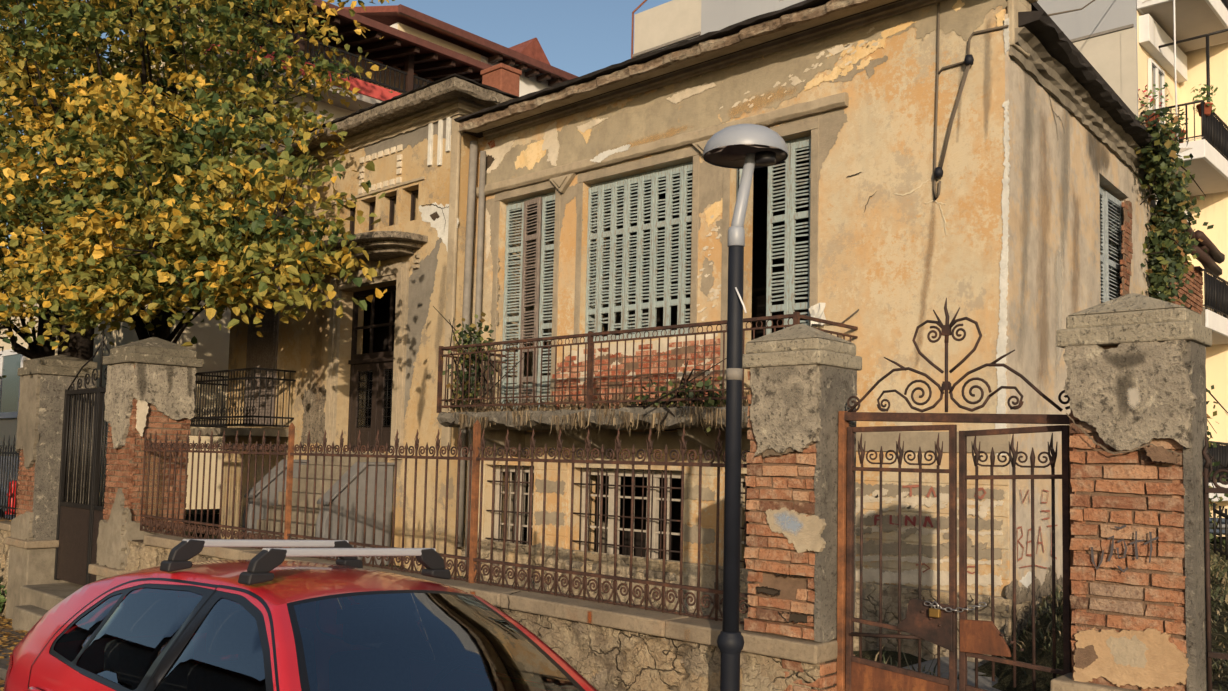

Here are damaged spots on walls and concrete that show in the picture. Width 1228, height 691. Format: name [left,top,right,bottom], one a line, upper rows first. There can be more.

peeling [479,0,1010,334]
peeling [404,202,459,419]
spalling [552,160,723,410]
spalling [994,100,1011,429]
leakage [1115,355,1142,412]
peeling [136,399,149,437]
spalling [762,431,819,457]
spalling [1066,413,1183,463]
spalling [764,507,826,553]
spalling [756,566,813,596]
spalling [778,612,814,623]
spalling [1073,627,1189,689]